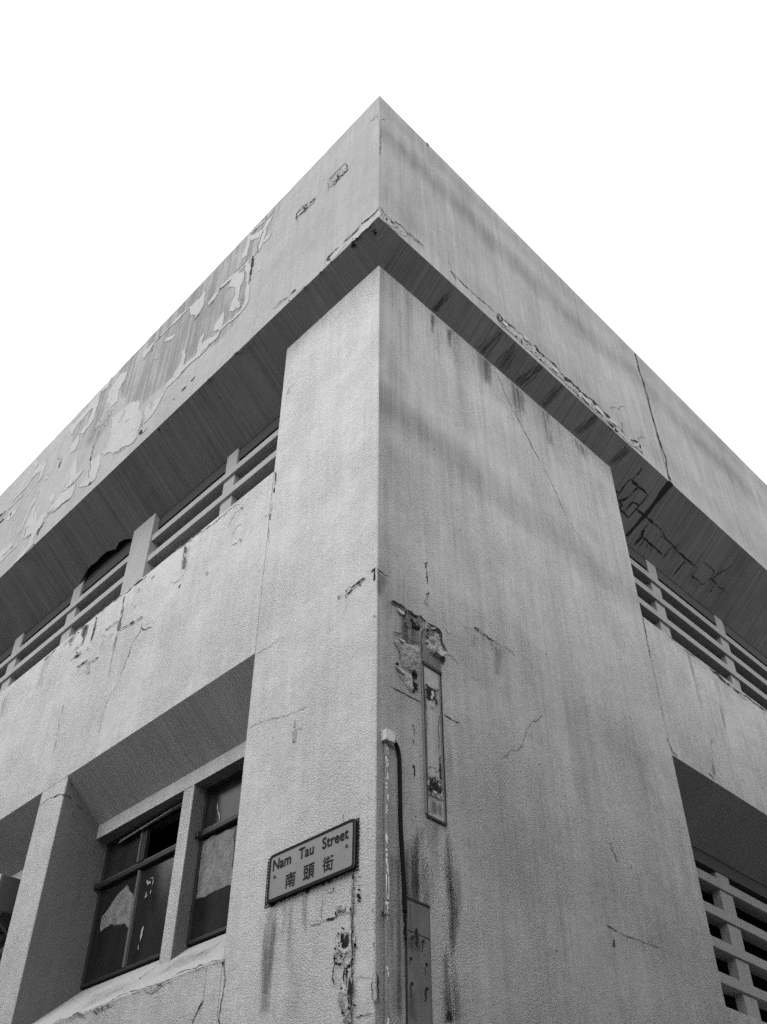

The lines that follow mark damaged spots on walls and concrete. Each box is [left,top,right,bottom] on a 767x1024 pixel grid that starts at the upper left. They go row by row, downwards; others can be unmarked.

crack [273,207,380,308]
peeling [0,208,274,564]
spalling [497,313,643,453]
crack [173,472,276,588]
crack [611,354,728,592]
crack [73,578,152,729]
flaking render [391,600,447,693]
flaking render [325,872,361,1024]
crack [602,897,664,950]